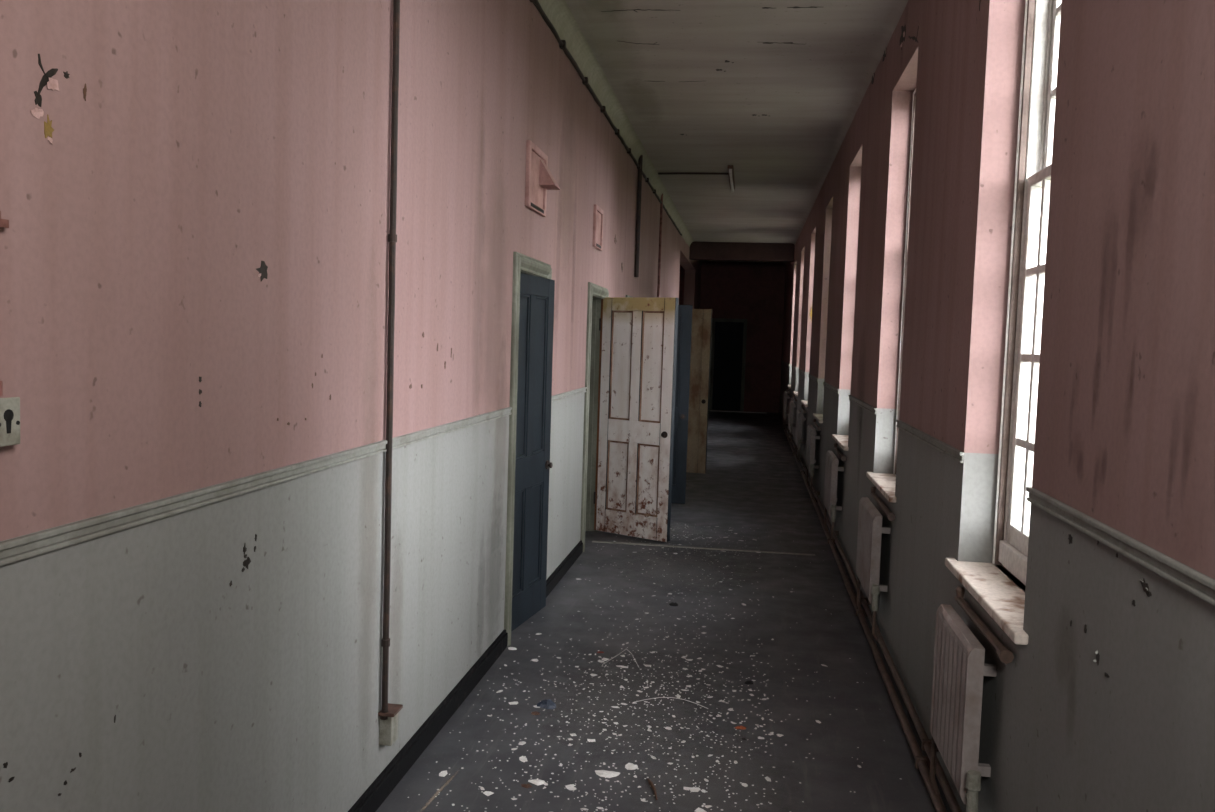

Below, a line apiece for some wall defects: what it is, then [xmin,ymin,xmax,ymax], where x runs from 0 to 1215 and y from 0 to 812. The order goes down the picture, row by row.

peeling [31,54,70,145]